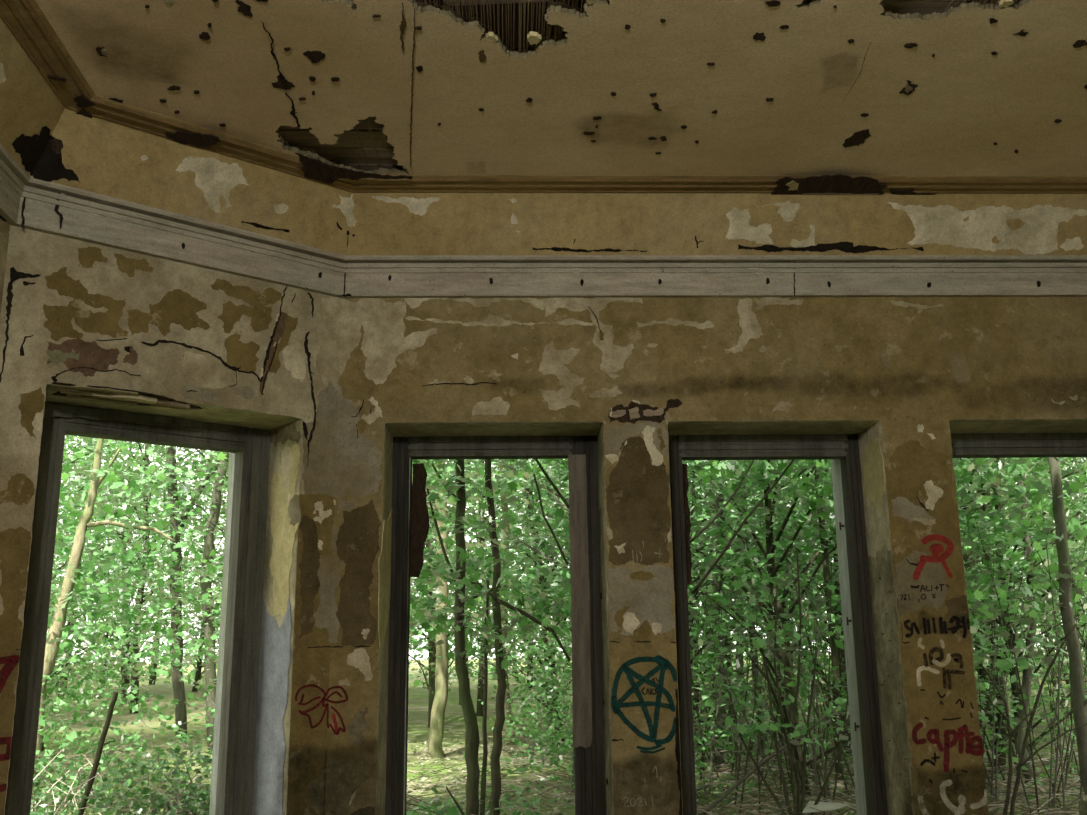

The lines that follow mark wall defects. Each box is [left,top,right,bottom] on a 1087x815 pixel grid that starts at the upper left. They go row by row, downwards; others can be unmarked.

spalling [408,0,610,63]
spalling [795,0,821,8]
spalling [879,0,1030,24]
crack [261,21,300,128]
spalling [12,126,80,183]
spalling [276,116,413,184]
peeling [726,174,1087,255]
crack [0,267,33,382]
flaking render [46,338,138,377]
crack [51,367,141,382]
crack [97,222,355,466]
peeling [269,296,682,646]